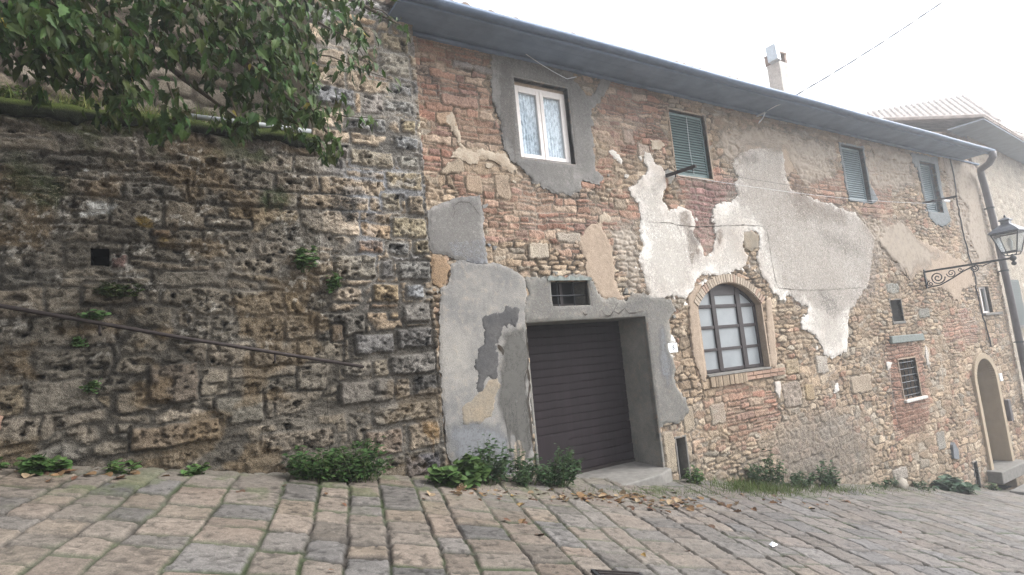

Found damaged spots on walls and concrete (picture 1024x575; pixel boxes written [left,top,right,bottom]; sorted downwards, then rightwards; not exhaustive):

peeling [446,112,518,184]
peeling [430,243,534,475]
peeling [573,126,997,360]